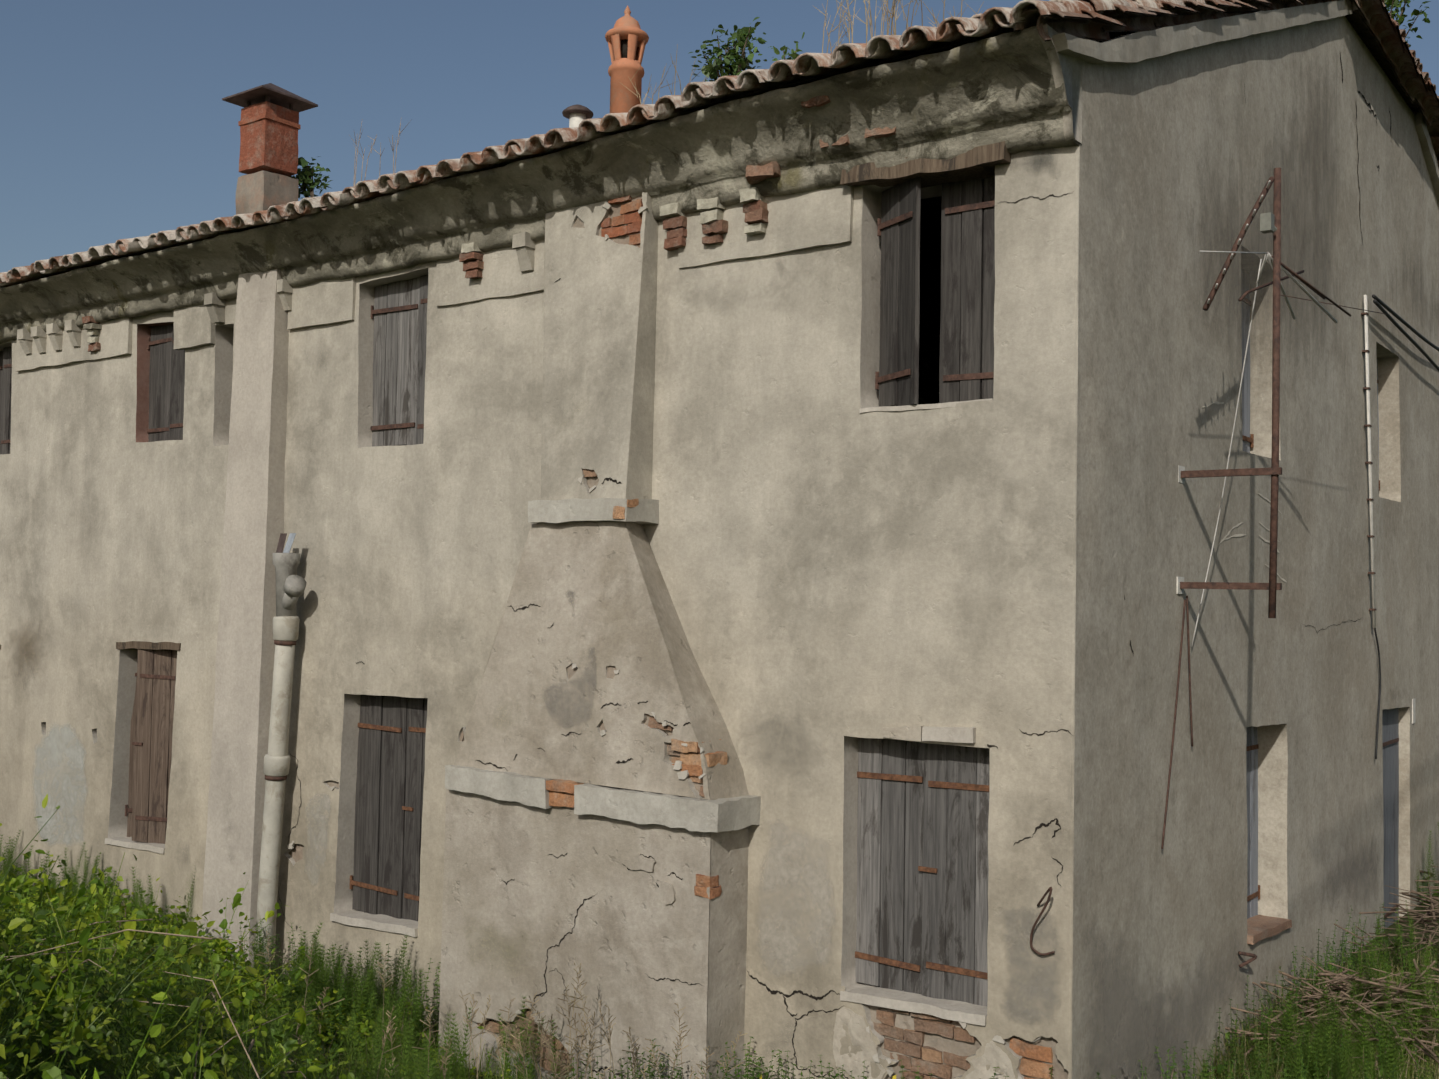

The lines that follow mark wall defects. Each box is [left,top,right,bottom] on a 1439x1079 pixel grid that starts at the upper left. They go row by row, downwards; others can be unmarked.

crack [1340,53,1392,247]
spalling [573,195,648,248]
spalling [644,712,728,798]
crack [1014,818,1063,886]
crack [534,895,595,1016]
crack [581,1062,626,1077]
crack [747,967,848,1079]
spalling [833,1005,1068,1079]